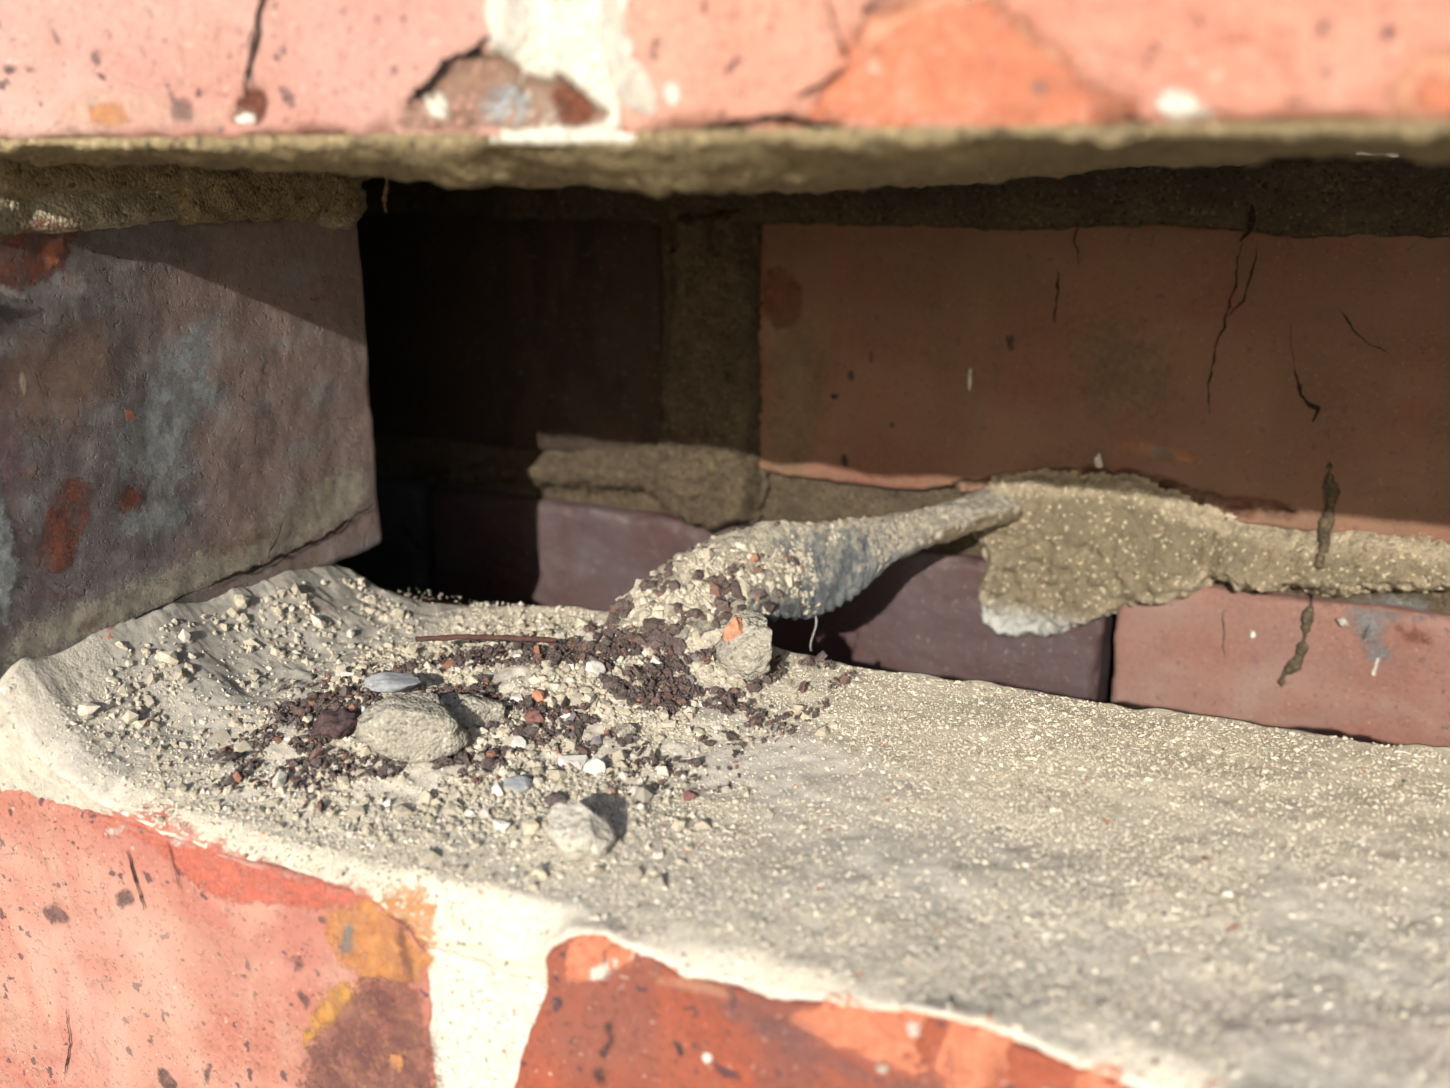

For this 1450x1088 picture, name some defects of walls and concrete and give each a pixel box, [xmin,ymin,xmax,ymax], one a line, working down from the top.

crack [243,0,264,101]
spalling [398,51,608,133]
spalling [807,0,1138,127]
crack [1053,221,1079,323]
crack [1207,204,1258,413]
crack [1290,324,1321,422]
crack [1336,308,1388,353]
leakage [112,310,229,541]
leakage [0,464,371,670]
spalling [565,924,649,982]
spalling [789,986,1013,1088]
spalling [1073,1063,1125,1088]